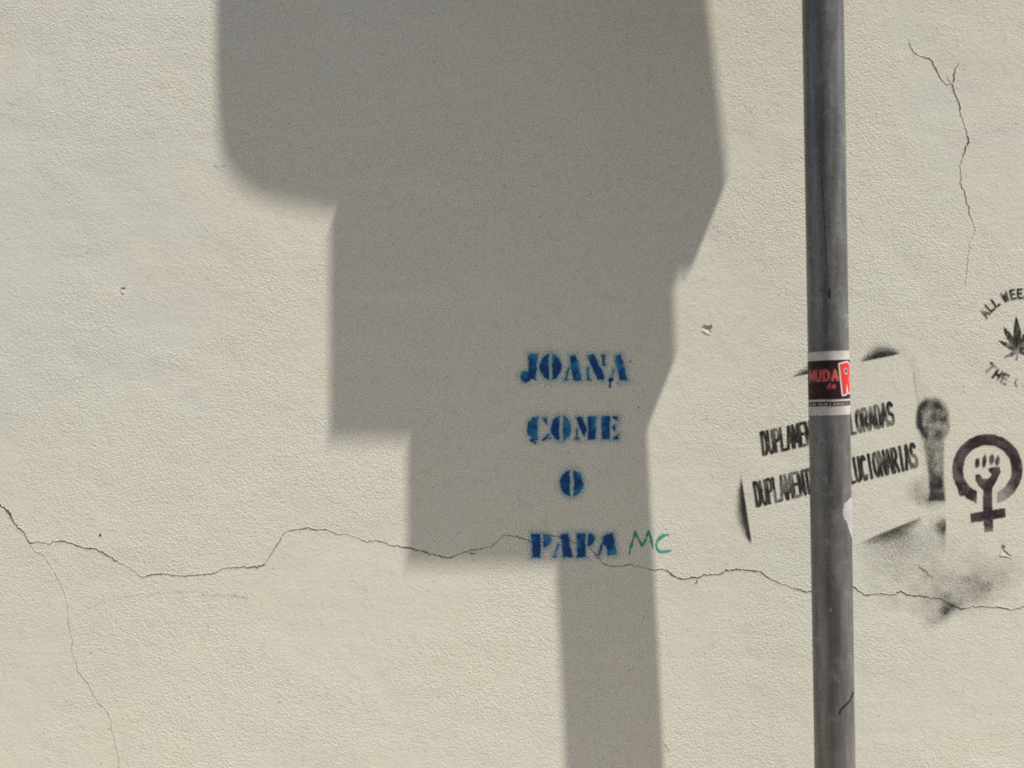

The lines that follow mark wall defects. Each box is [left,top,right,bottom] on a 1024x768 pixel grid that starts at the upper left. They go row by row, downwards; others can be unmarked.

crack [908,42,977,286]
crack [0,503,811,768]
crack [853,585,1024,613]